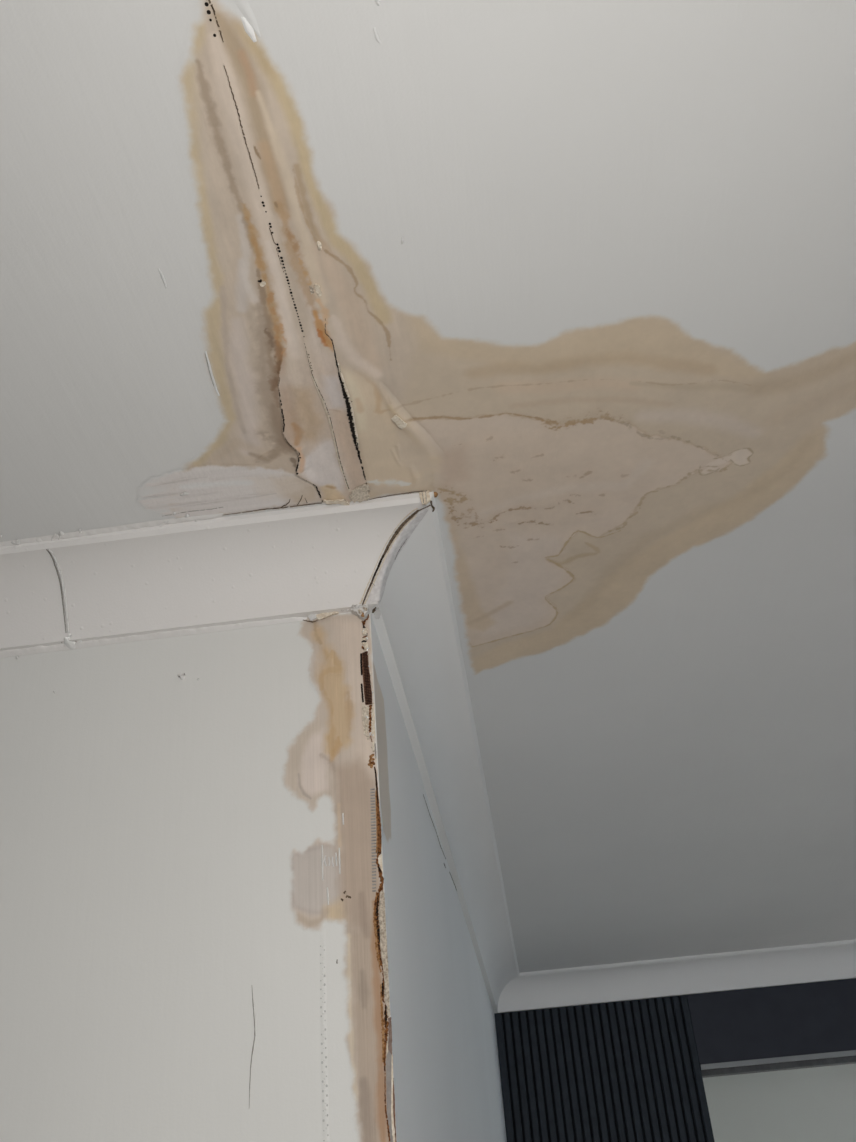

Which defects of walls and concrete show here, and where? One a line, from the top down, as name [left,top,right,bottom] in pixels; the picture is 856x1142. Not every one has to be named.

crack [208,0,261,188]
crack [165,371,323,516]
leakage [174,0,856,676]
leakage [280,610,397,1142]
flaking render [360,623,396,1142]